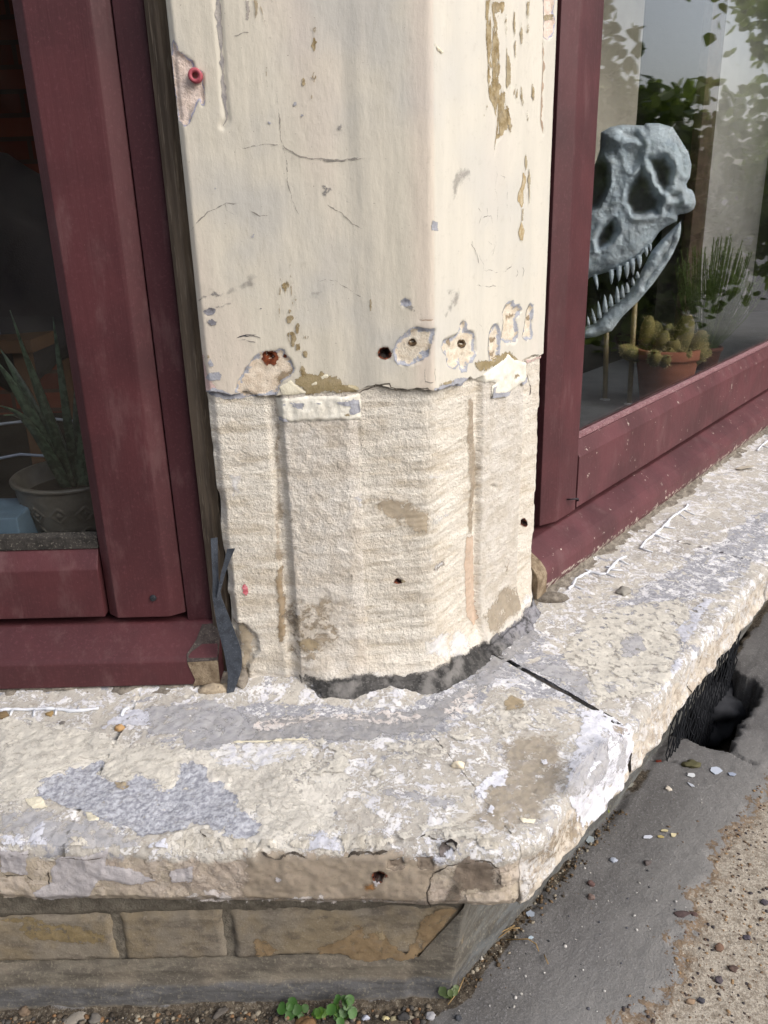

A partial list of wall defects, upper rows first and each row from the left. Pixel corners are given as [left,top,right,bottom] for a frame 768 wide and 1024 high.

spalling [171,40,205,127]
peeling [485,0,535,149]
crack [245,117,361,211]
corrosion [262,351,279,366]
flaking render [202,275,540,685]
peeling [560,586,715,843]
peeling [0,708,509,904]